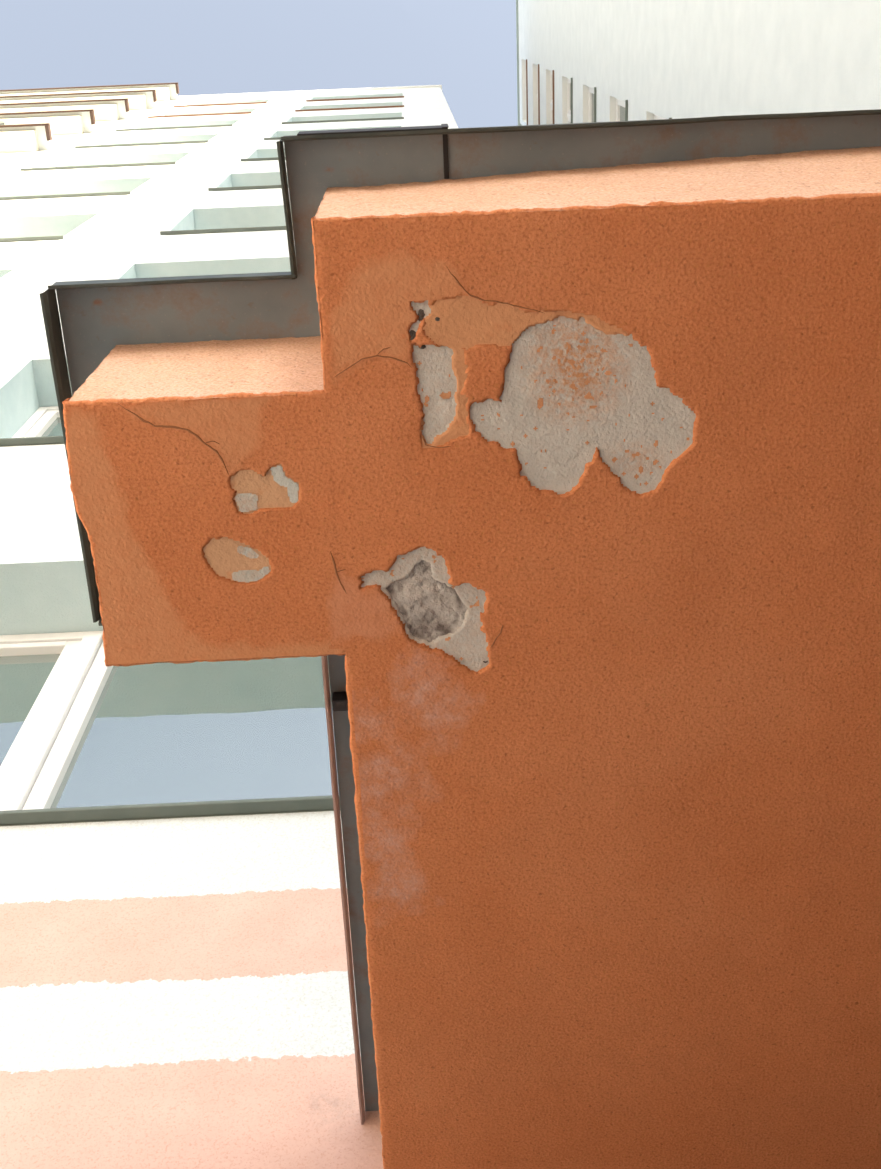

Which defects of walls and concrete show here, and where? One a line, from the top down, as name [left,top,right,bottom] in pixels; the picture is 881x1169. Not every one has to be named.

crack [120,405,228,473]
peeling [66,397,489,672]
crack [334,347,412,378]
peeling [327,246,696,494]